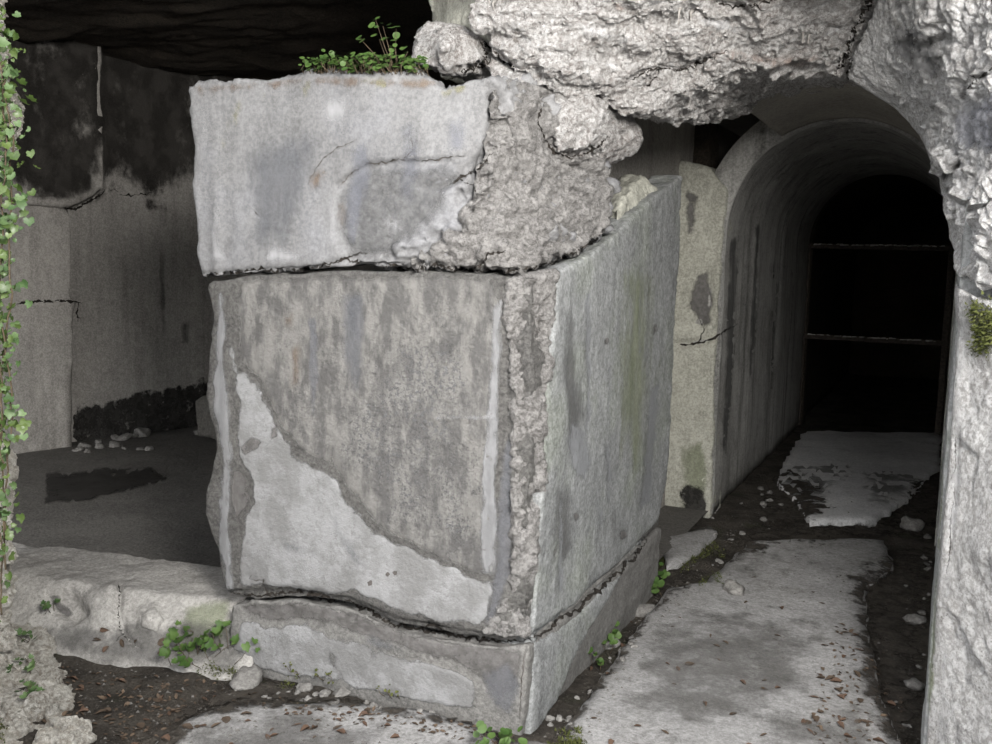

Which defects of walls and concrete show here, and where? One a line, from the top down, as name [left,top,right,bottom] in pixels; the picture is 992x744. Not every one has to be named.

crack [832,0,872,81]
crack [342,140,494,192]
crack [680,319,737,346]
peeling [238,78,615,695]
damp [680,485,706,518]
crack [234,538,647,716]